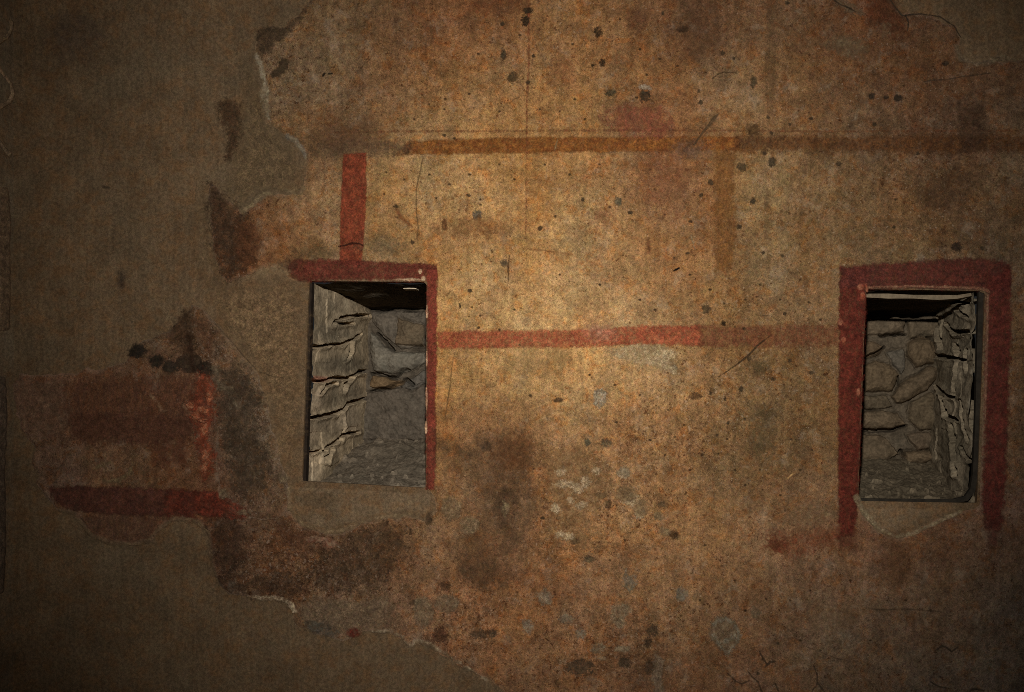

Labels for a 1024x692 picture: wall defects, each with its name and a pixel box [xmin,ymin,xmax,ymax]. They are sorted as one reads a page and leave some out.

peeling [255,2,311,120]
leakage [199,91,302,500]
spalling [128,308,404,548]
spalling [249,595,296,613]